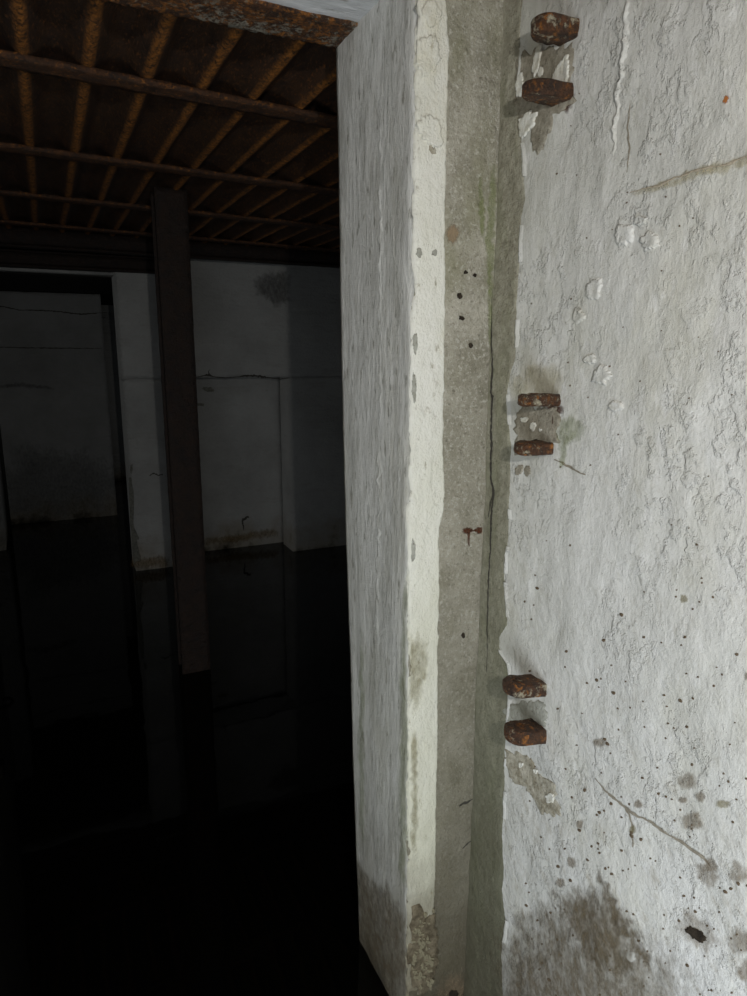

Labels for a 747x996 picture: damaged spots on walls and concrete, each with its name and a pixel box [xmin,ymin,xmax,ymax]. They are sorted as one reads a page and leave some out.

crack [486,288,495,672]
damp [564,877,648,971]